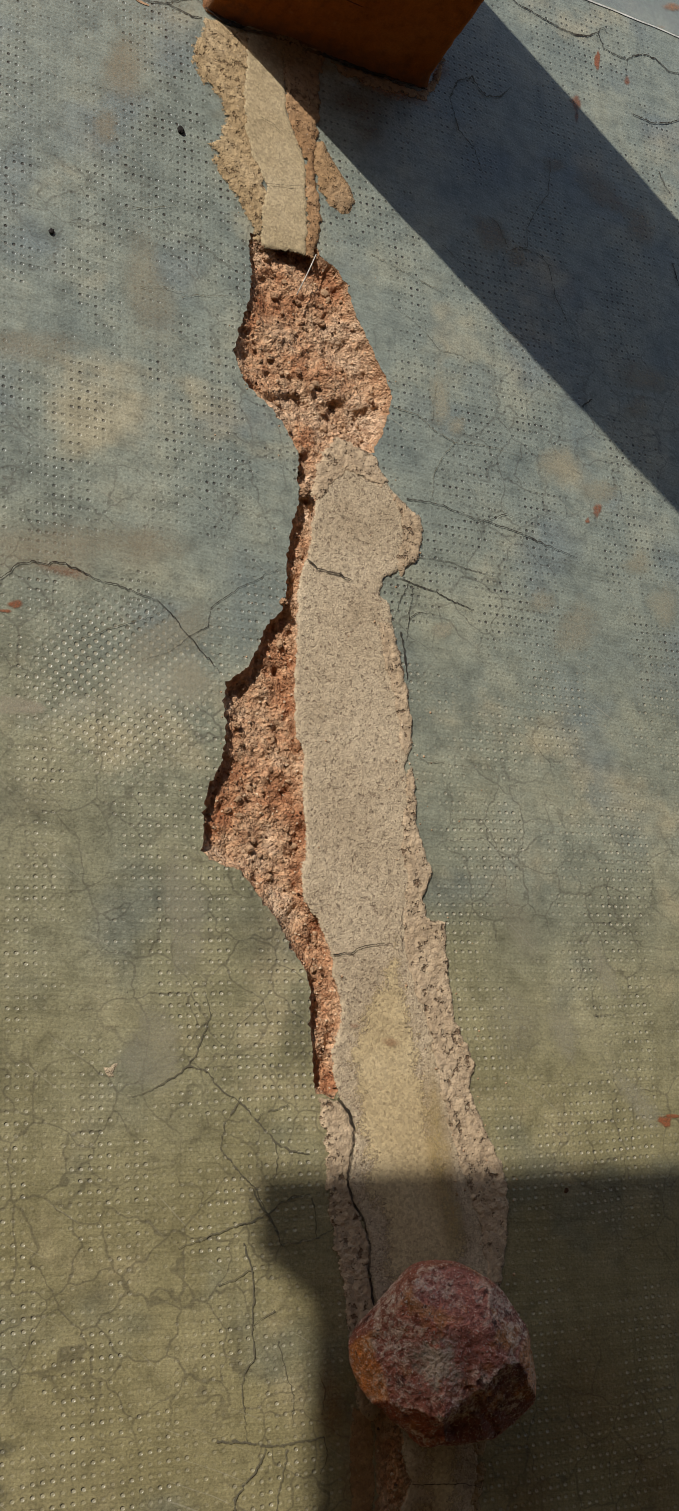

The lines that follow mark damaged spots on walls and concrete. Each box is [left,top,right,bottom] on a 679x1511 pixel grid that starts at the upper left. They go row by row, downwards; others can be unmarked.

crack [137,0,511,173]
crack [514,0,679,75]
crack [0,559,351,669]
spalling [200,233,392,1099]
crack [129,992,375,1511]